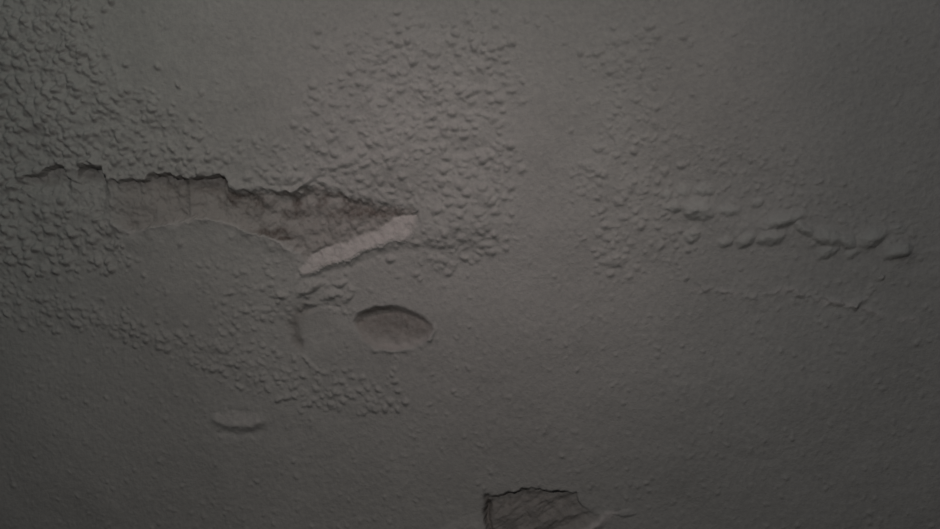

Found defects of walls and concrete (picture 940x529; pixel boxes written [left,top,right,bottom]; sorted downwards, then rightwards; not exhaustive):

peeling [9,154,419,275]
flaking render [352,304,440,354]
flaking render [438,487,620,529]